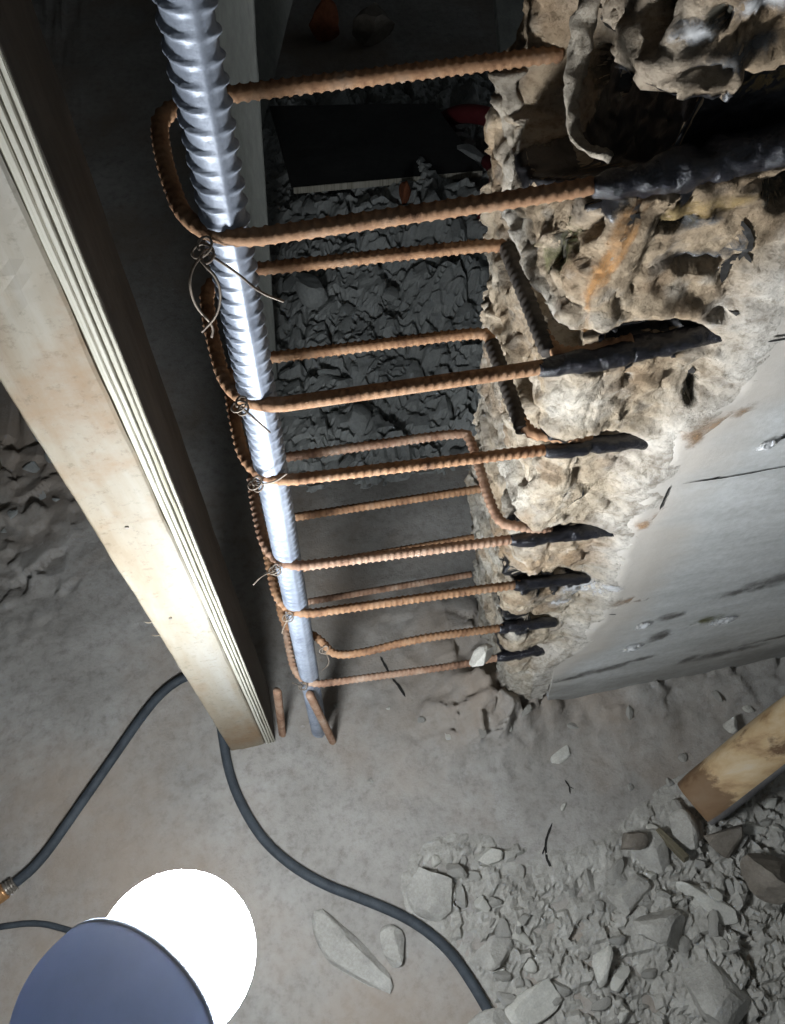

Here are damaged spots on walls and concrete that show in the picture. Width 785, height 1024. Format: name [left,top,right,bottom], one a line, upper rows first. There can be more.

spalling [480,0,785,194]
spalling [464,167,785,701]
crack [660,466,785,509]